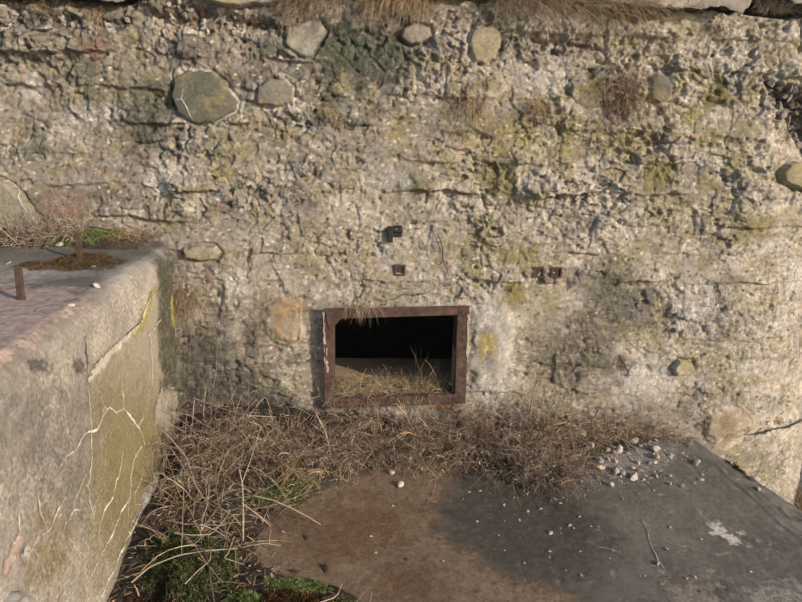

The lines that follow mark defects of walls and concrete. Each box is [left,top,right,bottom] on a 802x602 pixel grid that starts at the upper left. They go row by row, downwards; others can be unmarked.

spalling [762,73,802,150]
crack [126,317,161,386]
crack [744,420,802,436]
crack [7,336,165,602]